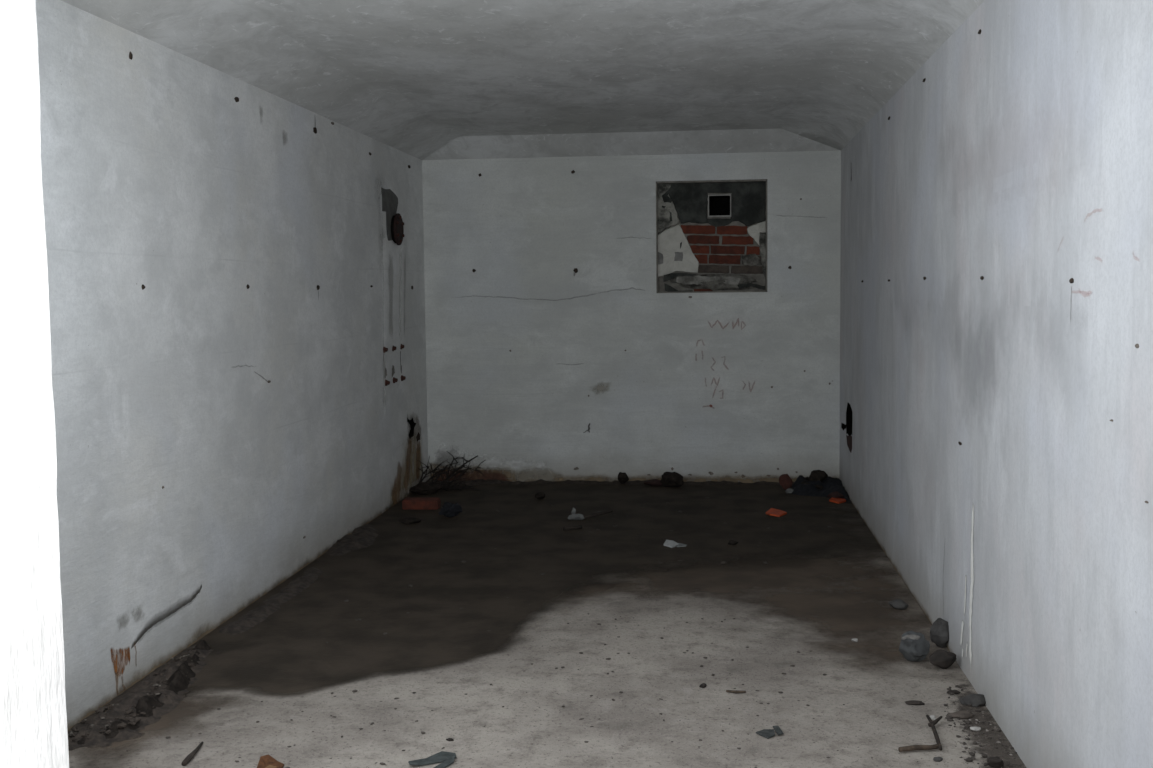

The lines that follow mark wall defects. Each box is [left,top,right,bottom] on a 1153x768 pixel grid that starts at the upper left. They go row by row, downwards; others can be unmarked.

spalling [657,182,766,292]
corrosion [391,440,422,506]
corrosion [111,645,137,694]